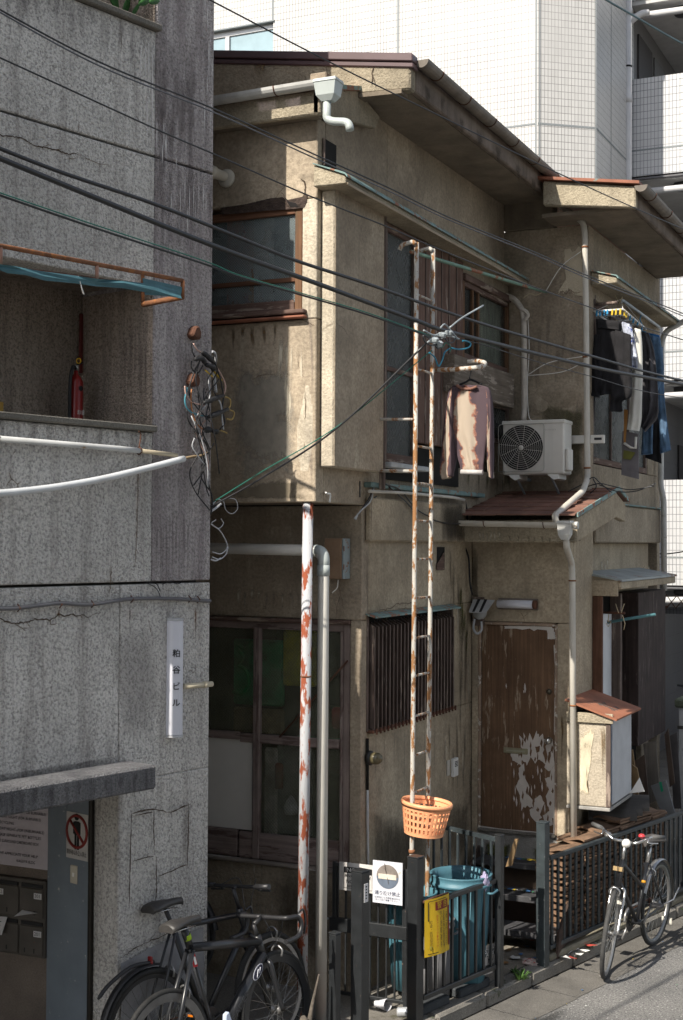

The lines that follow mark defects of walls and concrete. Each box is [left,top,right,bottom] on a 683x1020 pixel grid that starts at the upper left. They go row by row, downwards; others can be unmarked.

crack [0,126,108,169]
peeling [480,686,555,834]